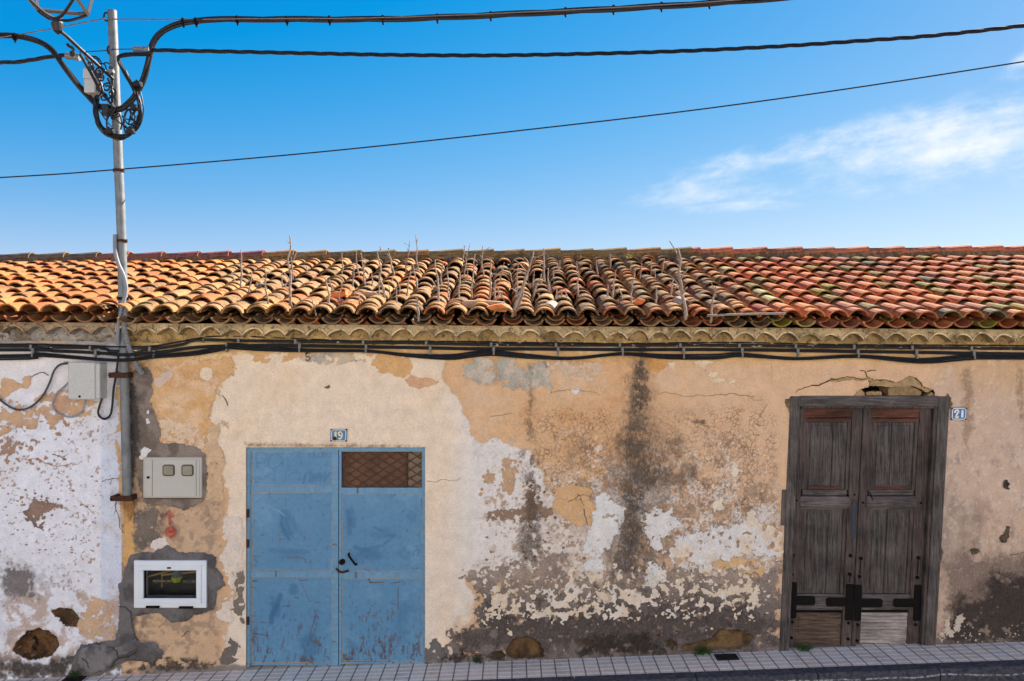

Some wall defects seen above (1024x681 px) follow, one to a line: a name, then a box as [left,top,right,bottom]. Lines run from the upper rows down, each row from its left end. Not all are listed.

peeling [462,356,603,395]
crack [795,370,876,393]
flaking render [854,376,959,414]
peeling [0,375,97,555]
leakage [426,347,783,664]
peeling [466,458,784,660]
peeling [51,596,116,641]
leakage [942,552,1024,644]
flaking render [13,628,59,660]